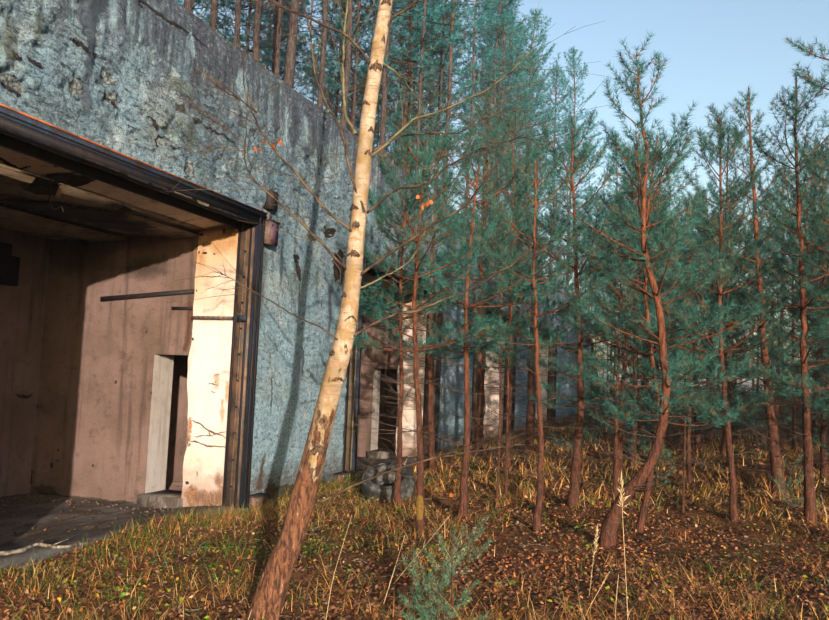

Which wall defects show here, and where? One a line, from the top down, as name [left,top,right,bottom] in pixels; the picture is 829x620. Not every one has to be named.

leakage [133,0,166,50]
leakage [78,0,107,114]
leakage [264,83,281,135]
leakage [291,104,299,144]
crack [188,420,226,448]